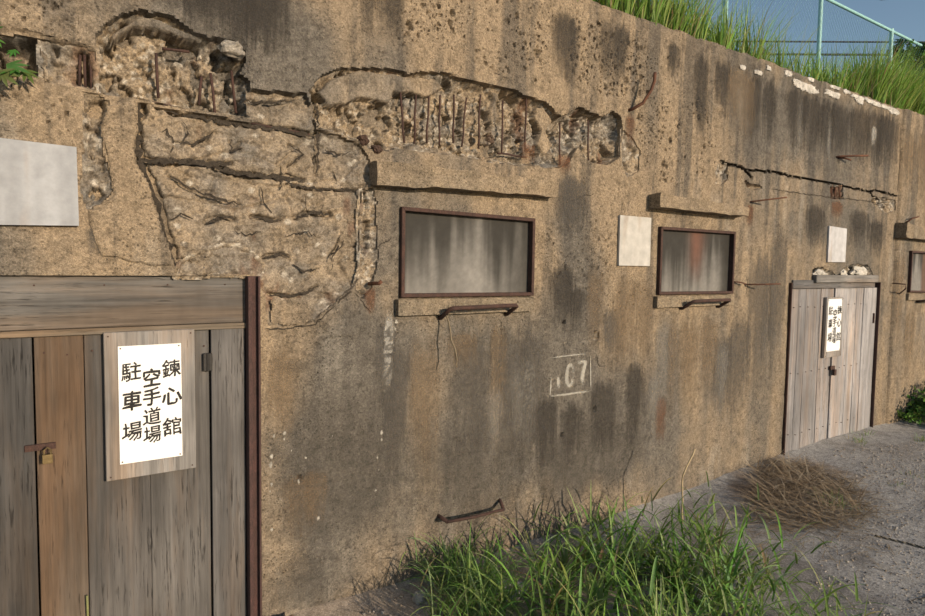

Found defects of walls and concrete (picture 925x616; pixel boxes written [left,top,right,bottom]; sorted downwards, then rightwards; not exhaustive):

leakage [669,45,679,73]
leakage [695,55,736,125]
leakage [745,77,777,125]
peeling [784,70,900,116]
leakage [788,87,899,157]
crack [135,104,175,265]
spalling [0,0,727,345]
crack [720,131,901,205]
leakage [852,212,882,248]
spalling [812,264,872,275]
leakage [376,320,415,441]
leakage [456,332,615,456]